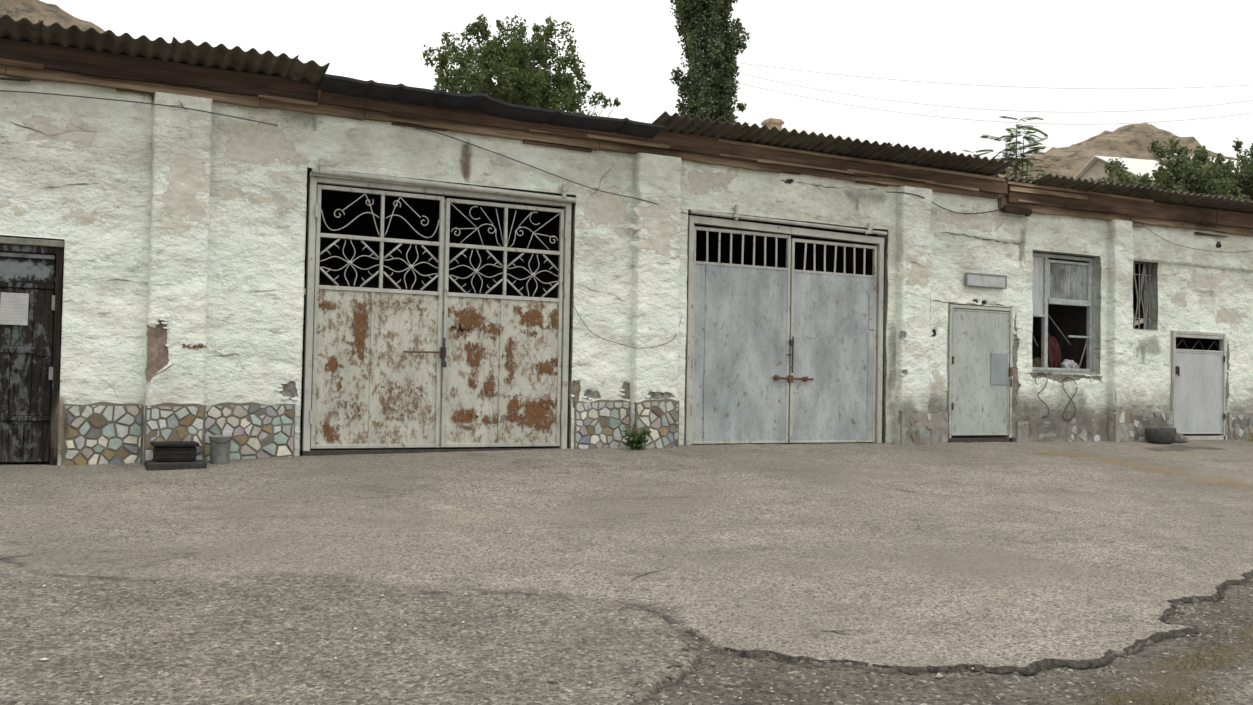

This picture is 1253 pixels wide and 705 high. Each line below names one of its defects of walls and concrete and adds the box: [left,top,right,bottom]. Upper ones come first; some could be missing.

spalling [145,316,171,384]
corrosion [318,297,428,443]
corrosion [443,305,562,433]